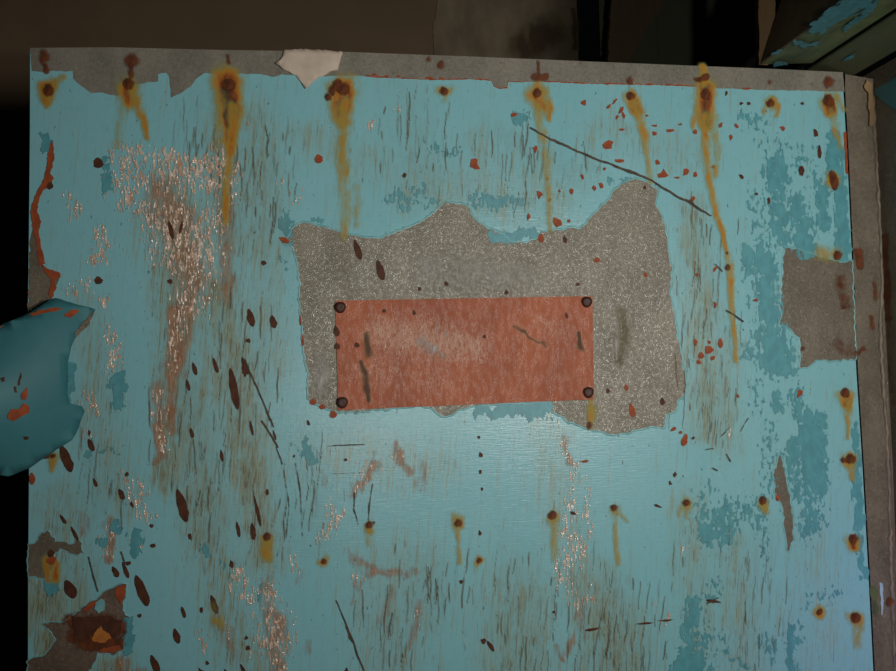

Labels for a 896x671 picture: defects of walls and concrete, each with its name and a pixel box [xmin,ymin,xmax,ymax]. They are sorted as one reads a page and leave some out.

corrosion [118,54,149,140]
corrosion [211,55,244,225]
corrosion [325,75,356,188]
corrosion [525,61,554,231]
corrosion [623,78,652,183]
corrosion [691,64,738,363]
peeling [0,132,120,485]
peeling [278,160,697,446]
peeling [681,102,857,570]
peeling [26,469,158,671]
peeling [176,489,189,522]
crack [336,600,365,671]